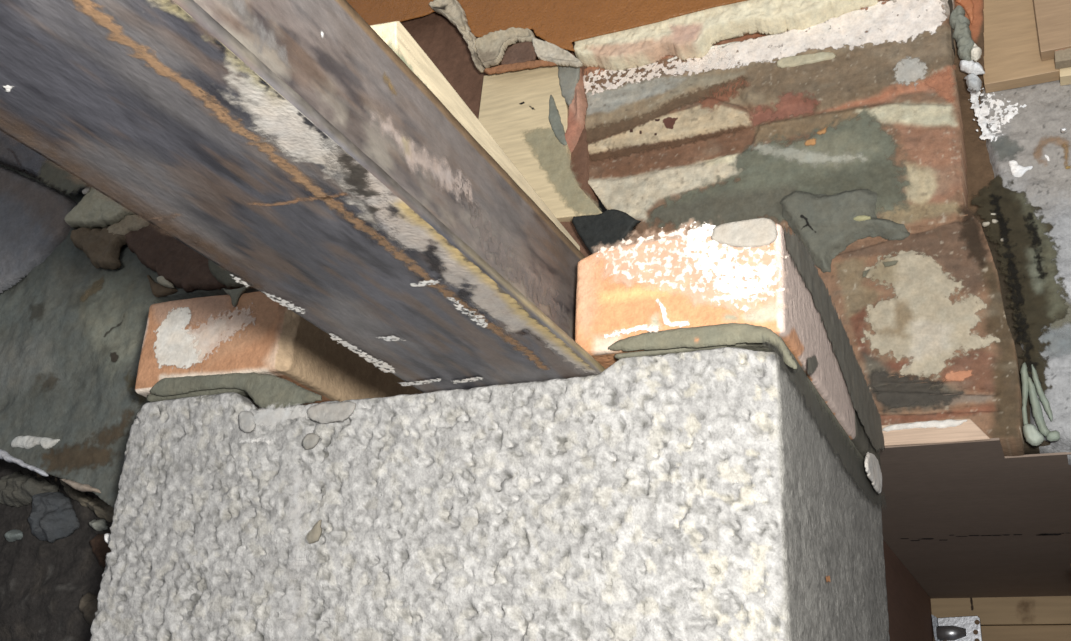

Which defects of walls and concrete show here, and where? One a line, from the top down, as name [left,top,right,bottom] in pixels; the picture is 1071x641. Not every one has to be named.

efflorescence [153,303,255,369]
rust [74,0,549,370]
efflorescence [596,222,787,339]
leakage [960,207,986,265]
leakage [990,194,1071,388]